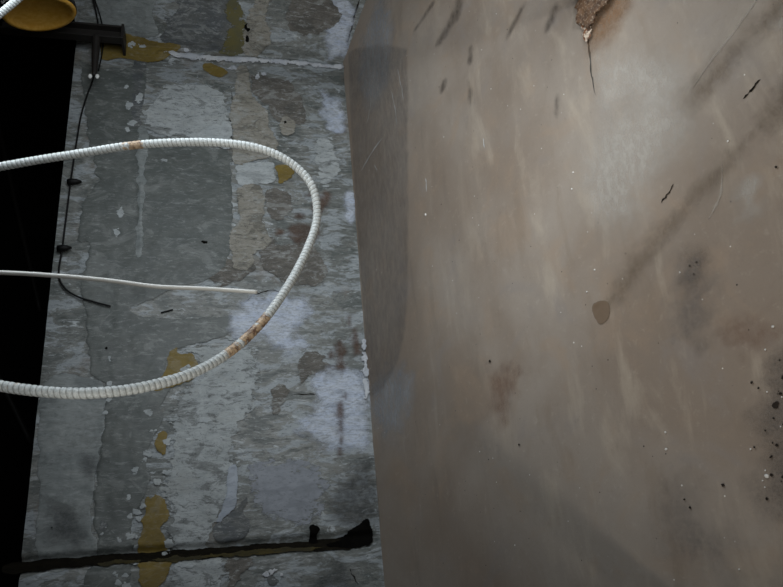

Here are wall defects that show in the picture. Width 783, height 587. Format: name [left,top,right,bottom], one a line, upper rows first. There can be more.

damp [326,0,355,58]
spalling [574,0,607,41]
crack [587,40,595,93]
efflorescence [320,93,344,133]
efflorescence [345,192,355,222]
efflorescence [231,293,312,352]
damp [299,369,409,448]